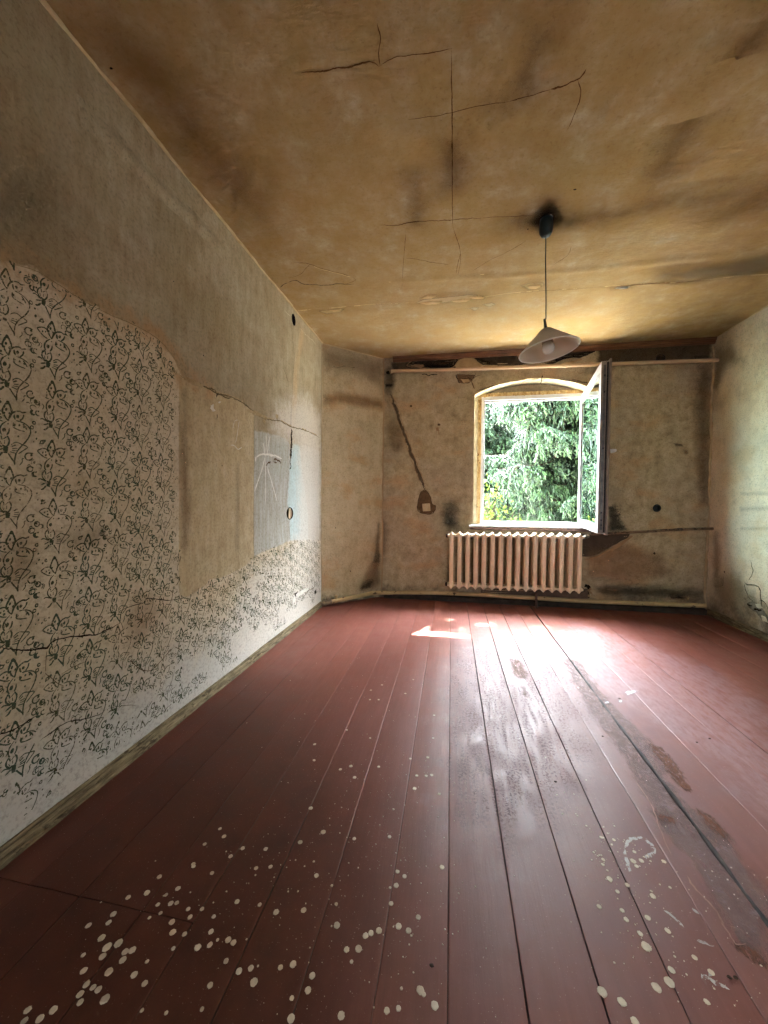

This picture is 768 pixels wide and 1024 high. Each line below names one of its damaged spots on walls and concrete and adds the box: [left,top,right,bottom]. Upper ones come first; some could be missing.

crack [302,25,768,297]
peeling [4,260,318,437]